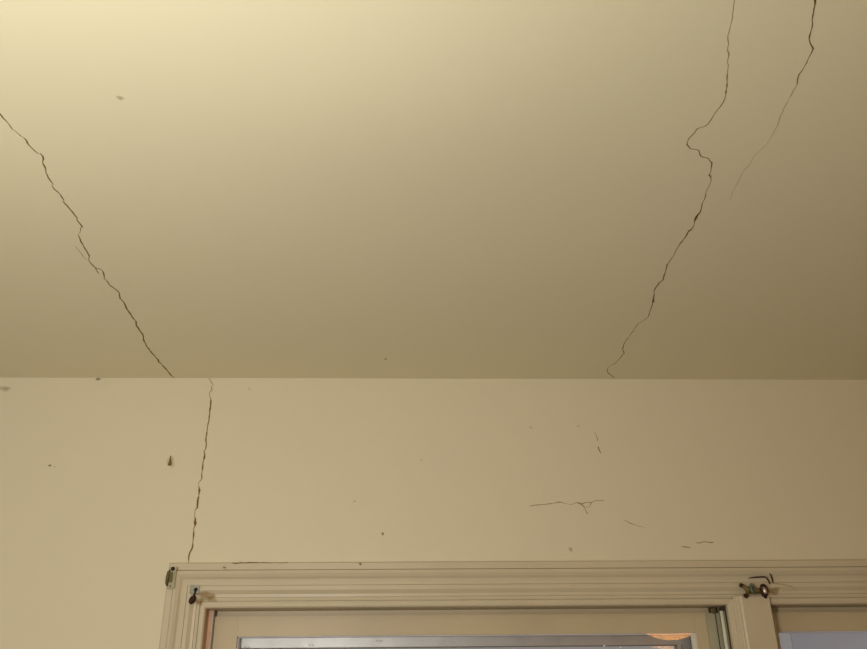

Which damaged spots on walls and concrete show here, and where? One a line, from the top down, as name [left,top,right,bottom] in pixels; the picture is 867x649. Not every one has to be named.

crack [0,114,174,378]
crack [607,0,735,377]
crack [730,0,816,200]
crack [188,379,213,563]
crack [530,500,604,514]